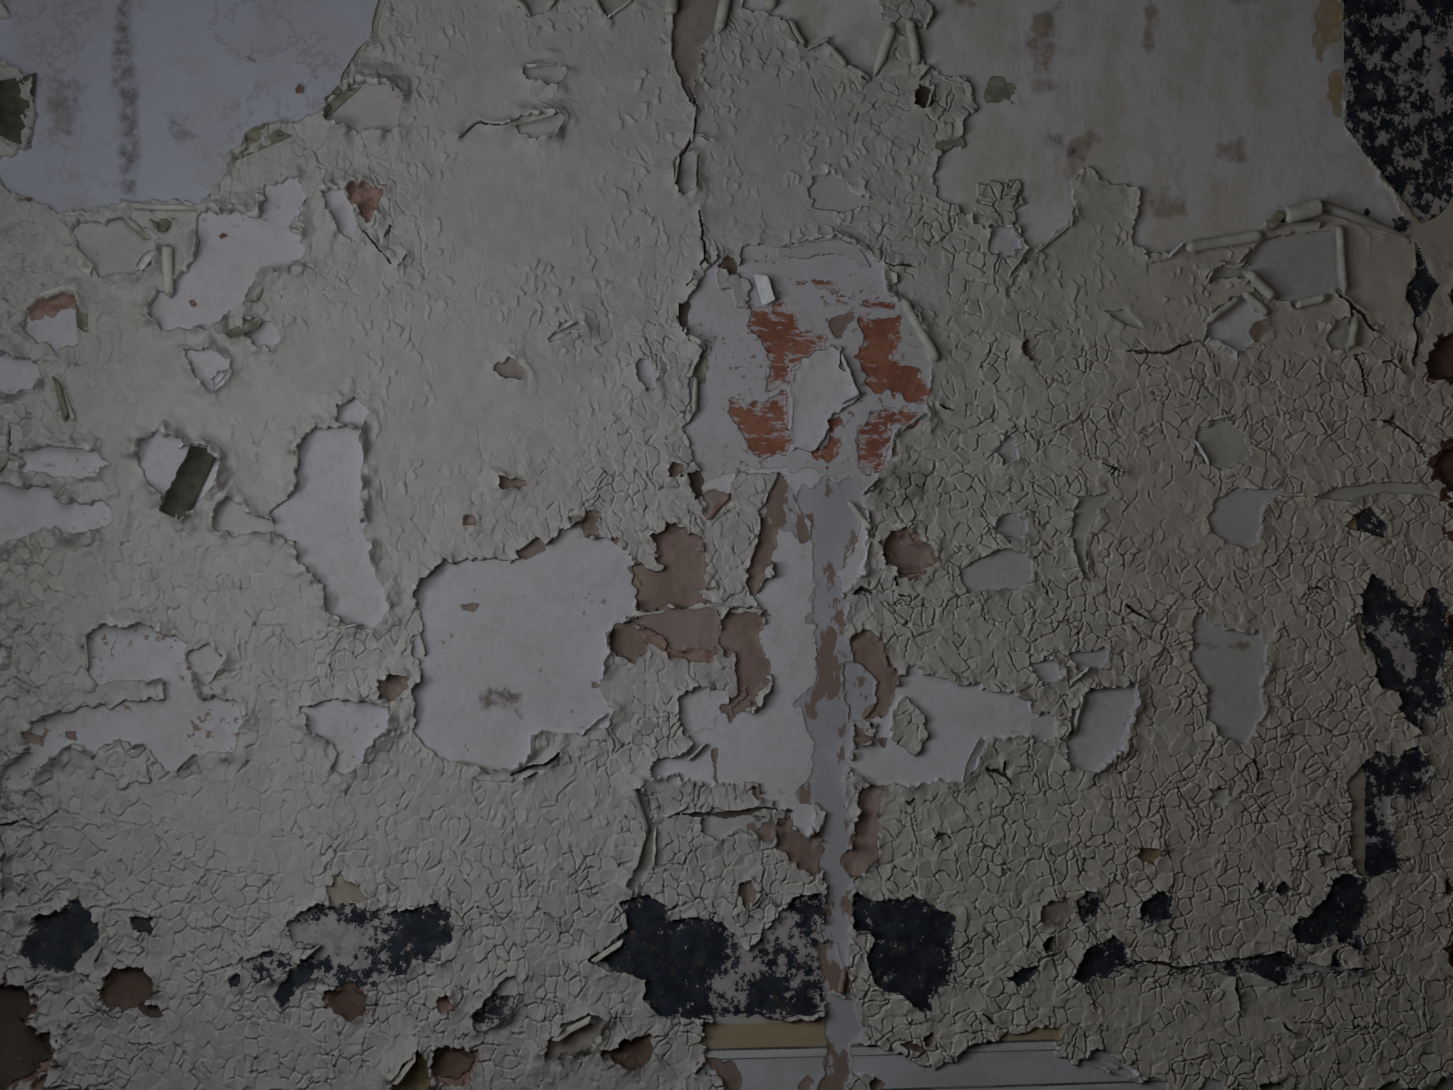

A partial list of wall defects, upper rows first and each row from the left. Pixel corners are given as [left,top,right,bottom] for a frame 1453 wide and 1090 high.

peeling [0,0,403,391]
peeling [664,0,1411,361]
crack [361,225,407,265]
crack [1337,291,1428,466]
spalling [1428,440,1453,509]
peeling [299,235,1143,891]
crack [853,576,910,597]
crack [511,752,560,780]
crack [986,761,1012,784]
peeling [855,933,875,963]
crack [1137,960,1192,970]
spalling [0,978,80,1090]